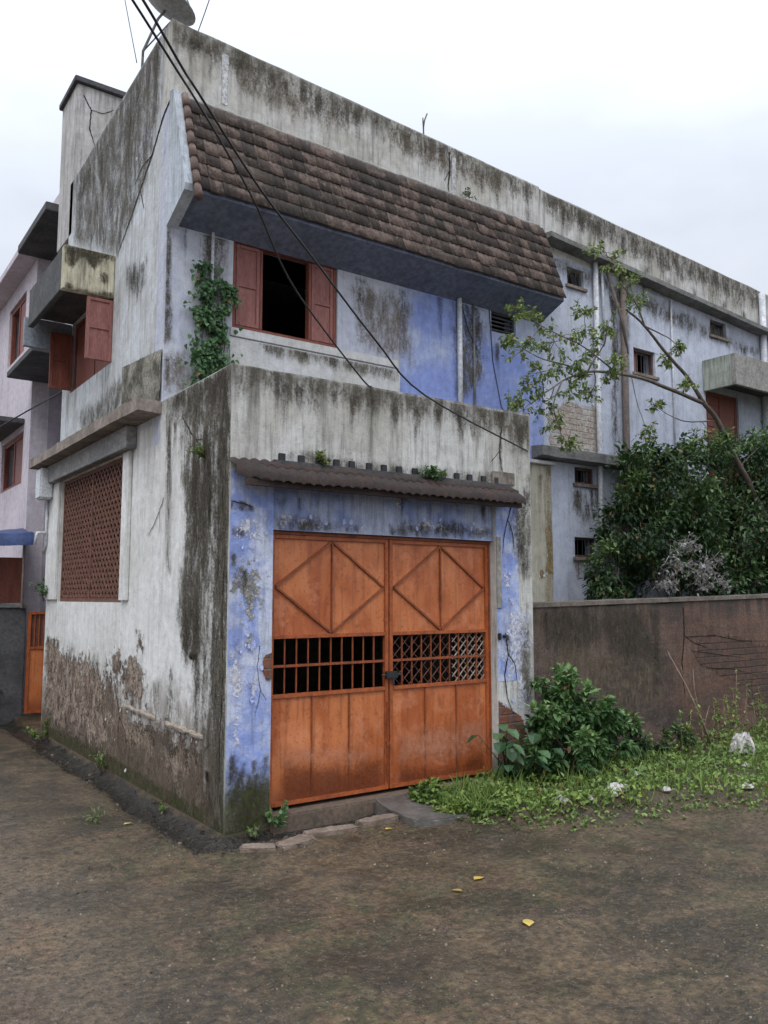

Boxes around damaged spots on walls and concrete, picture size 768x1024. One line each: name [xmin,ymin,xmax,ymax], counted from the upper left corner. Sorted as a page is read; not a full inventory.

crack [84,96,113,145]
water stain [359,279,409,354]
water stain [241,304,528,447]
flaking render [548,400,604,453]
water stain [544,194,759,317]
water stain [554,259,757,371]
water stain [42,357,270,833]
peeling [227,517,272,749]
flaking render [44,629,213,823]